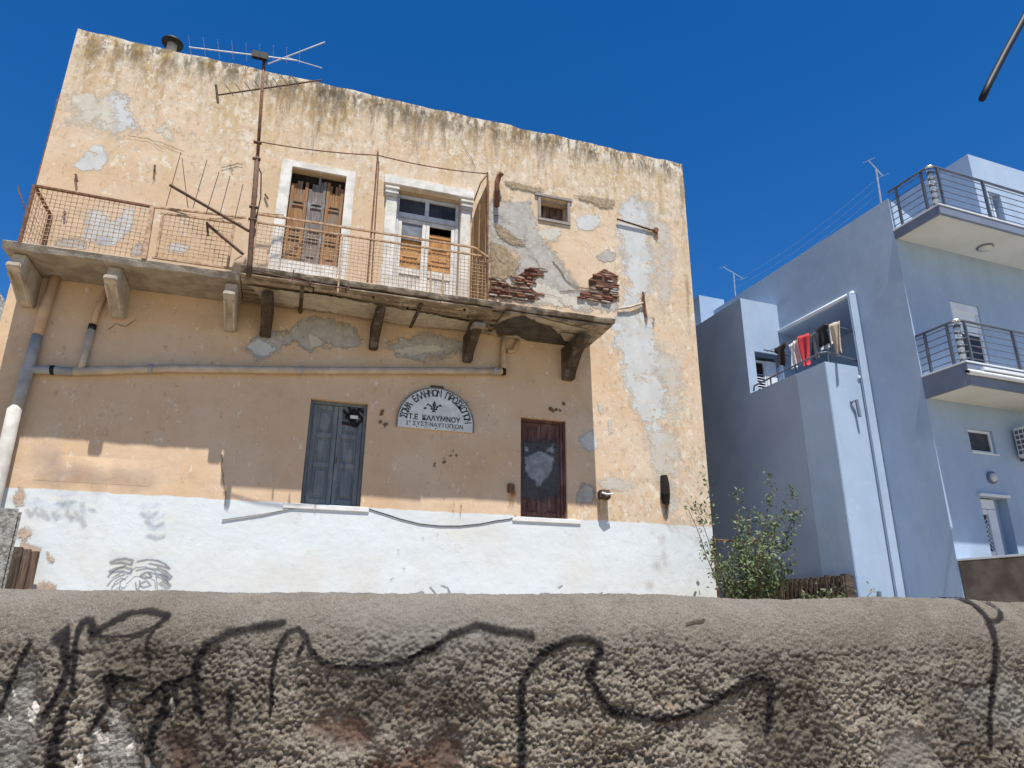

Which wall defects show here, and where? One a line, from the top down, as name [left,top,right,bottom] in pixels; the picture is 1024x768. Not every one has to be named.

peeling [67,89,174,171]
peeling [54,207,134,249]
peeling [246,286,470,363]
peeling [489,180,685,525]